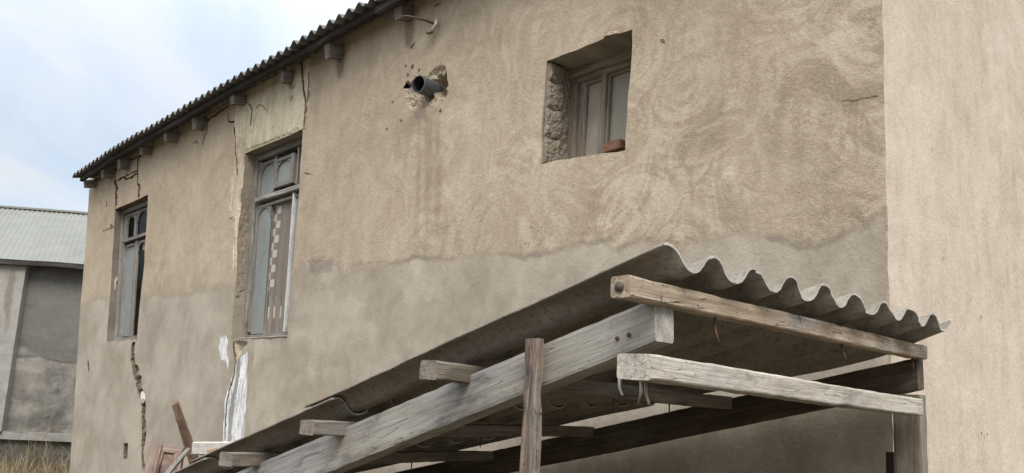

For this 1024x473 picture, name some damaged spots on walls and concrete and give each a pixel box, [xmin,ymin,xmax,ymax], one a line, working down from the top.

crack [193,57,309,175]
flaking render [400,63,449,122]
crack [94,155,142,231]
peeling [218,336,248,369]
crack [131,342,147,470]